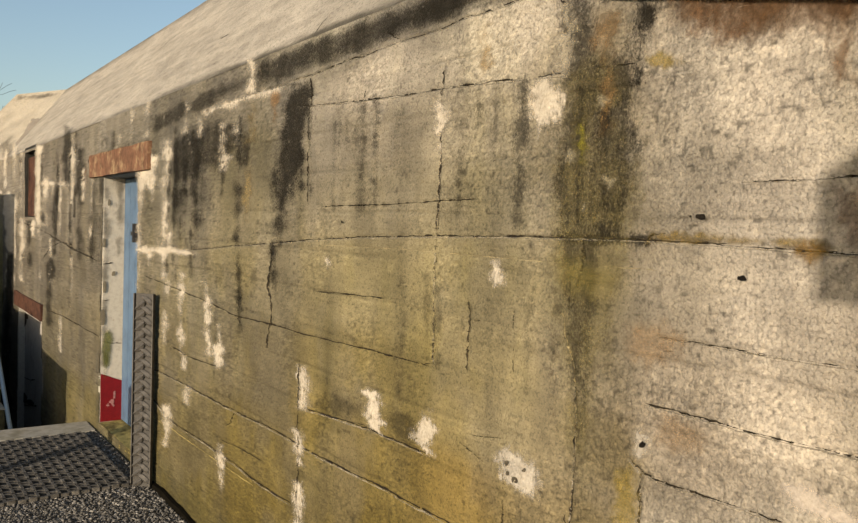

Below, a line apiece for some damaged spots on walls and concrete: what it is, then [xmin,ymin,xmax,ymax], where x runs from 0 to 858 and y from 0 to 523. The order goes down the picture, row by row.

damp [130,0,469,312]
crack [217,0,563,202]
damp [528,0,658,259]
efflorescence [204,288,225,367]
crack [146,113,858,523]
efflorescence [296,367,309,409]
efflorescence [361,390,387,435]
efflorescence [408,417,437,454]
efflorescence [291,482,306,523]